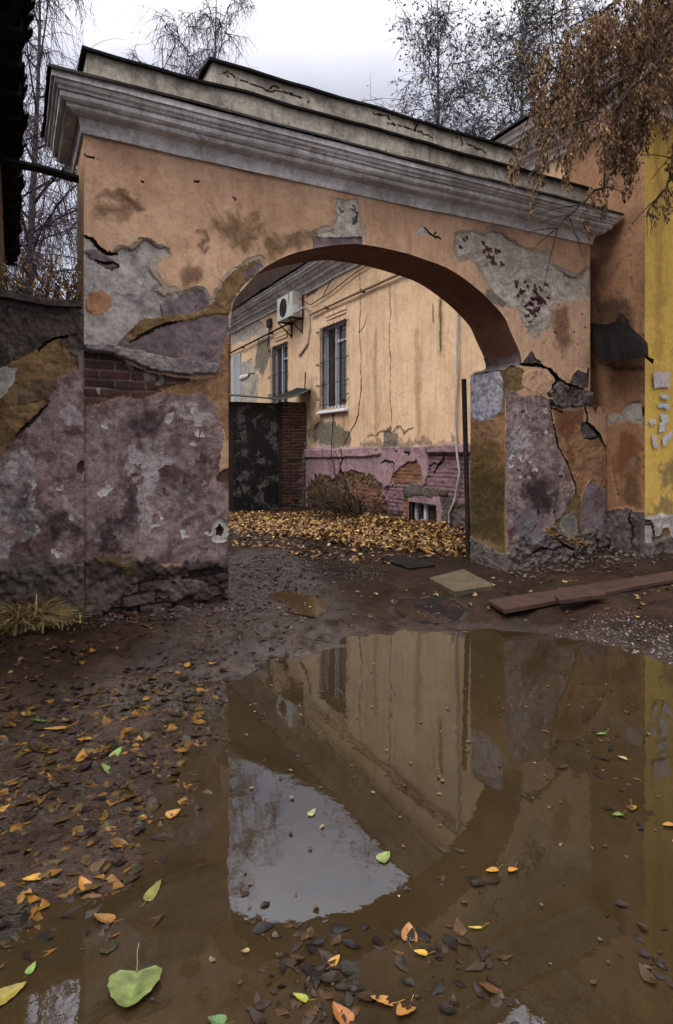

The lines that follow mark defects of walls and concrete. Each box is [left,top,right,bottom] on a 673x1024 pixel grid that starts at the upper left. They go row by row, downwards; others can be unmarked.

crack [223,71,310,104]
crack [84,235,120,268]
spalling [308,197,367,248]
peeling [0,237,271,627]
spalling [348,225,673,572]
crack [520,362,606,494]